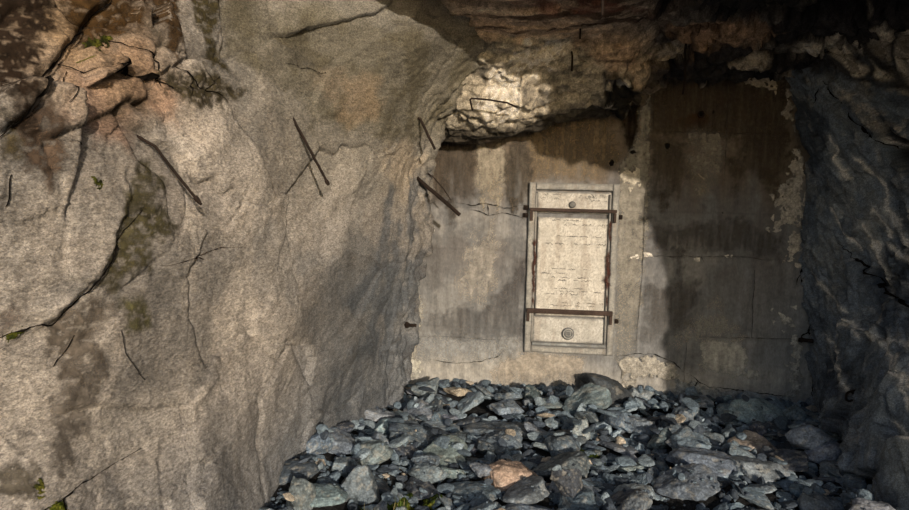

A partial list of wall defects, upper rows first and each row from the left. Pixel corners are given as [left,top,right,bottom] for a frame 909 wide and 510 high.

crack [456,202,522,218]
damp [435,76,792,378]
peeling [766,149,806,268]
crack [421,336,502,363]
spalling [617,355,680,389]